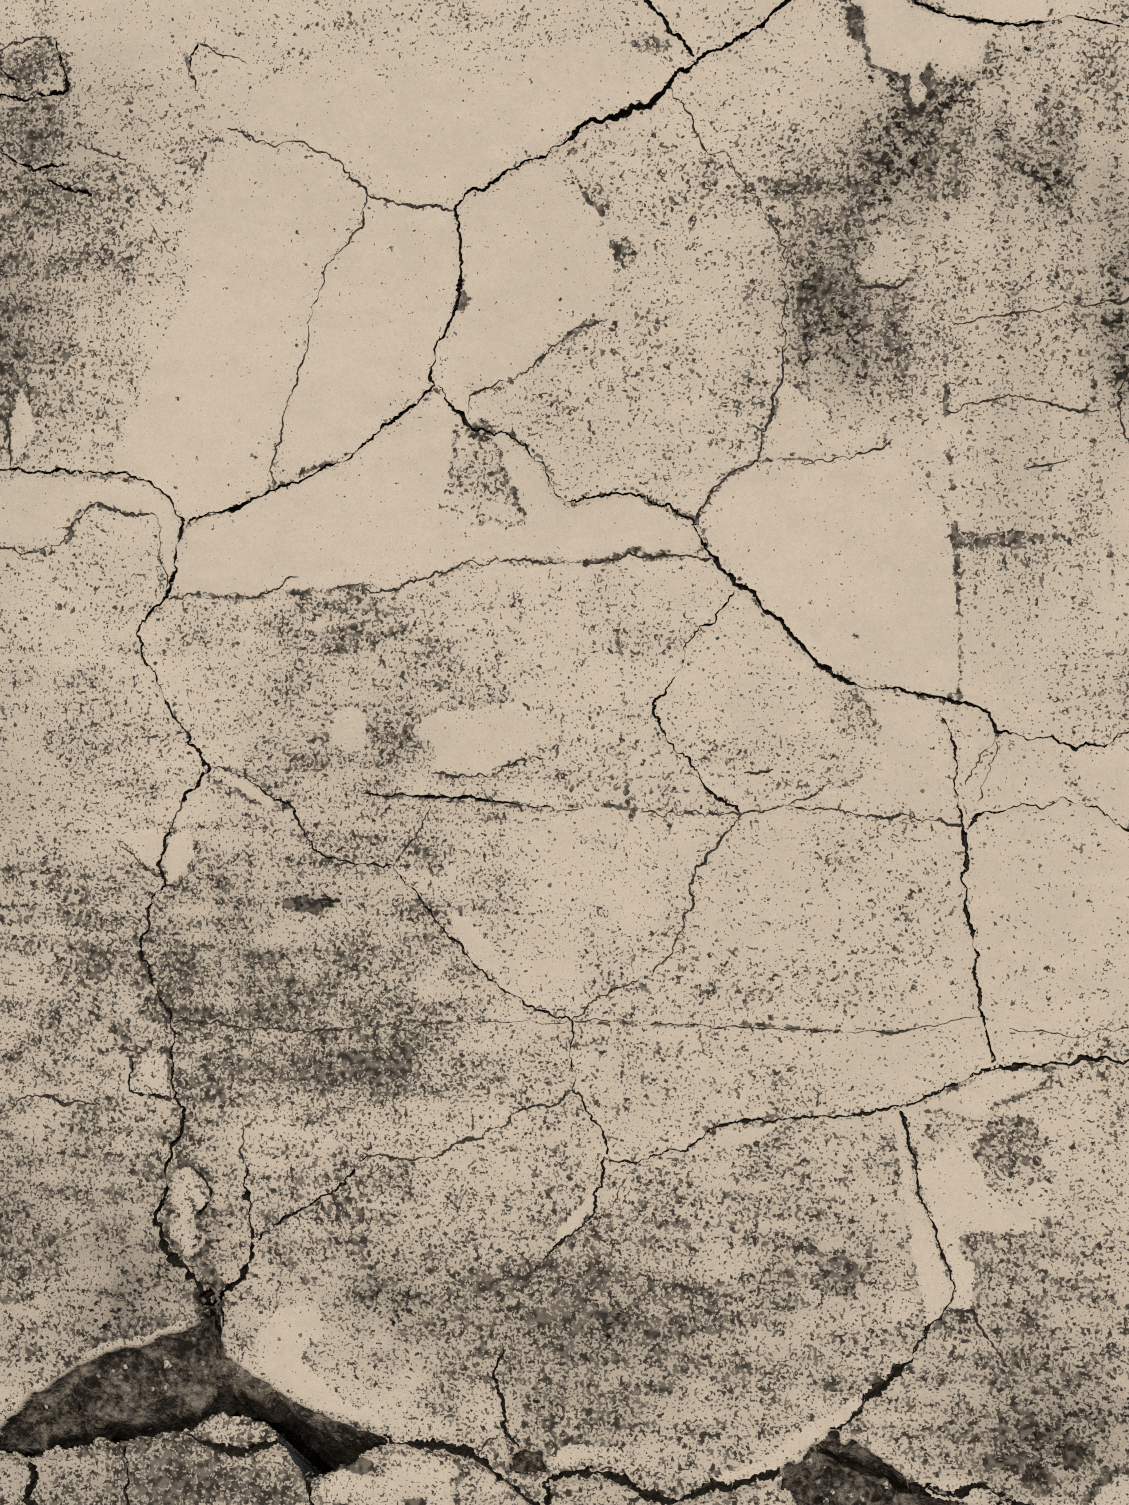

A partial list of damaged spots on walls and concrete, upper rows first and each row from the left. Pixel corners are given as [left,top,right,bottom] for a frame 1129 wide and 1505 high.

crack [904,0,1129,31]
crack [0,0,797,827]
crack [945,380,1129,442]
crack [583,525,1129,976]
crack [108,828,493,1313]
crack [213,712,1129,1434]
flaking render [0,1305,461,1505]
crack [182,1427,283,1461]
crack [386,1339,782,1505]
flaking render [719,1394,965,1505]
crack [925,1479,1049,1505]
flaking render [1088,1473,1129,1505]